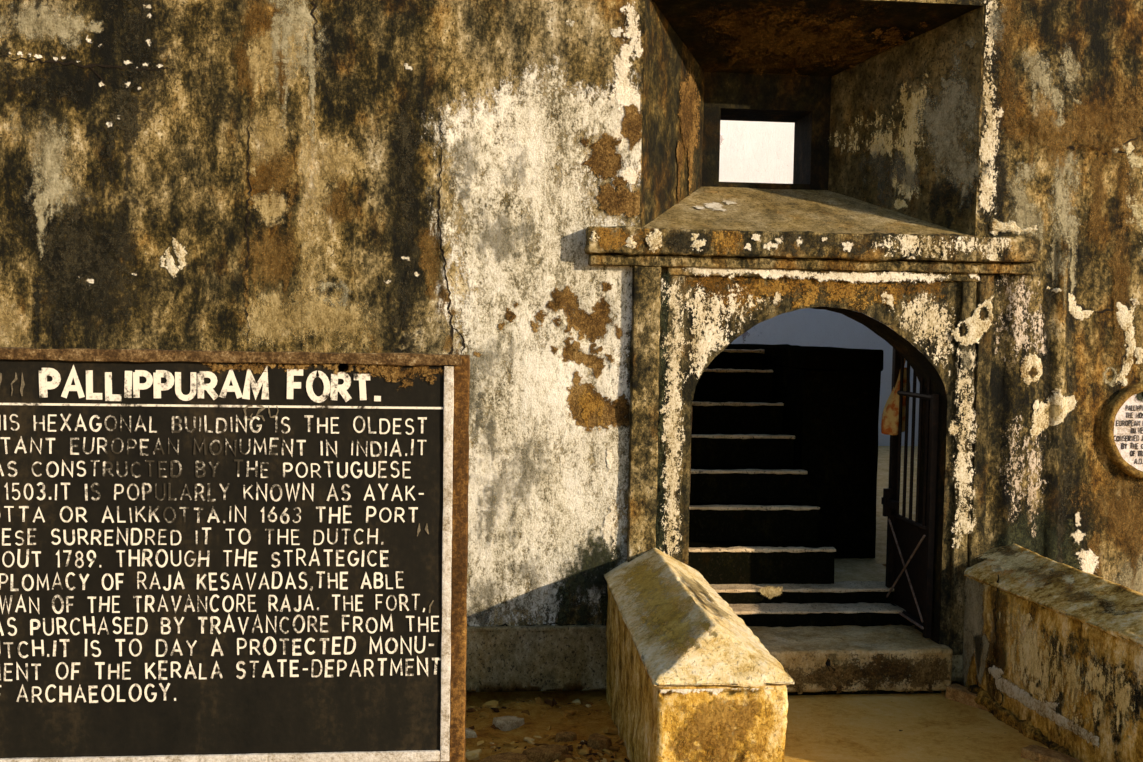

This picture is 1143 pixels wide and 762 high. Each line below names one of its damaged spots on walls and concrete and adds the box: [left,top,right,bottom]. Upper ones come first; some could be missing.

water stain [0,0,174,349]
water stain [245,0,321,352]
crack [437,111,465,355]
water stain [468,342,548,542]
peeling [401,1,662,626]
crack [499,620,591,628]
water stain [509,503,717,655]
water stain [655,272,947,552]
flaking render [660,0,1094,555]
water stain [864,0,1080,397]
water stain [1043,629,1143,762]
peeling [1116,298,1143,386]